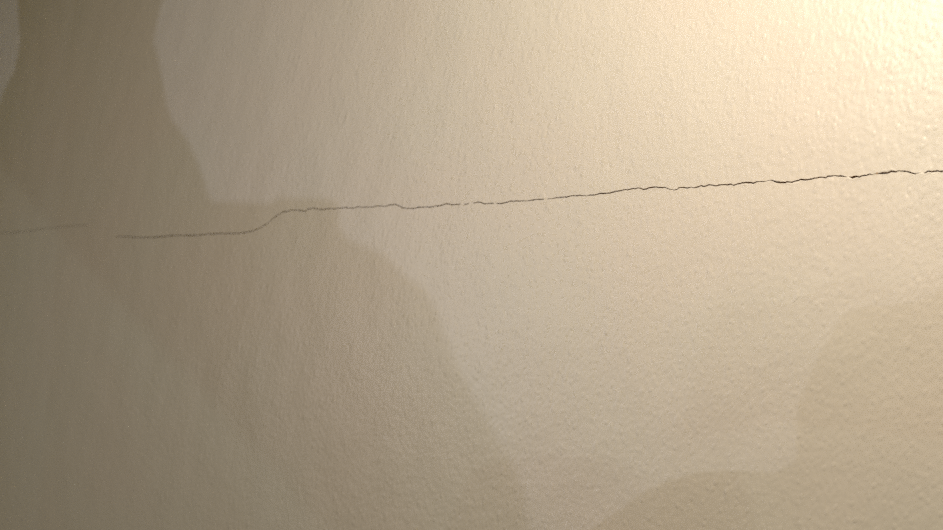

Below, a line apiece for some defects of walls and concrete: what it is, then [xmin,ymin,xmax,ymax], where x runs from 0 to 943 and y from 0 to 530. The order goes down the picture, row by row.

crack [116,168,943,238]